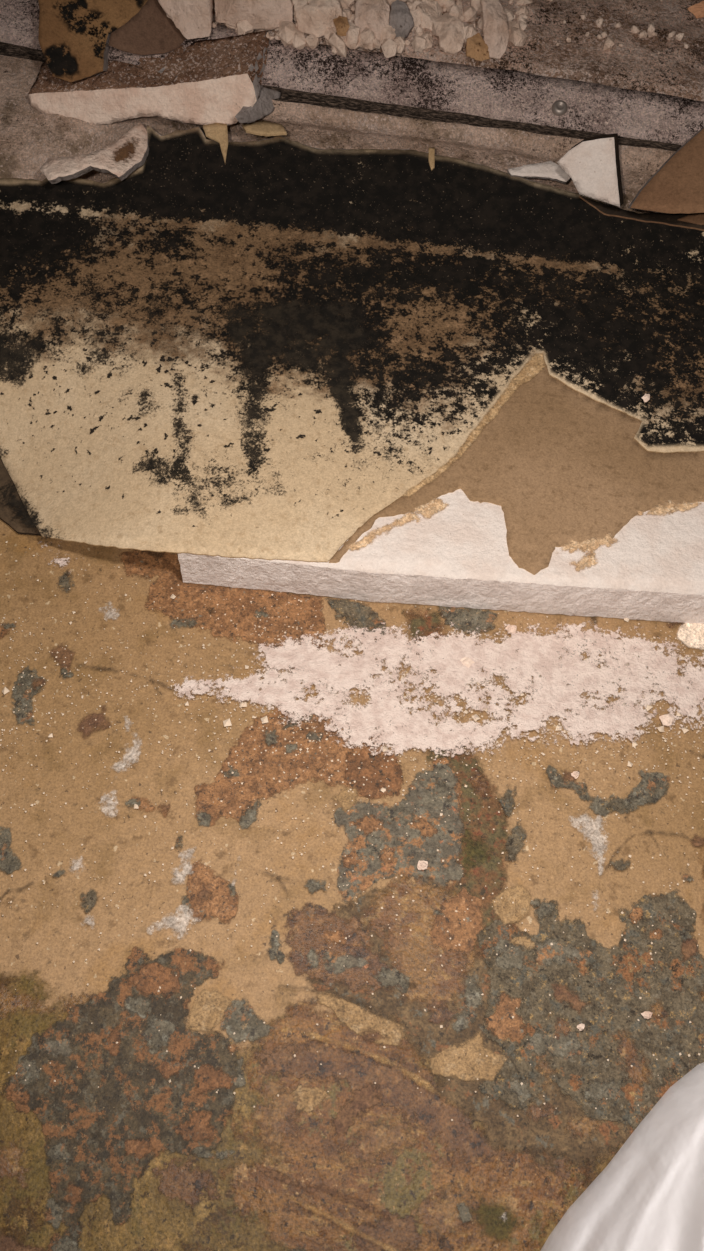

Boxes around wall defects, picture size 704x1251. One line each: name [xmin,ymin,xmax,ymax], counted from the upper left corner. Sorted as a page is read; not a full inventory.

water stain [0,131,704,539]
peeling [439,606,497,634]
water stain [427,745,515,957]
water stain [0,984,93,1019]
water stain [252,1071,303,1153]
water stain [338,1116,419,1168]
water stain [411,1184,484,1240]